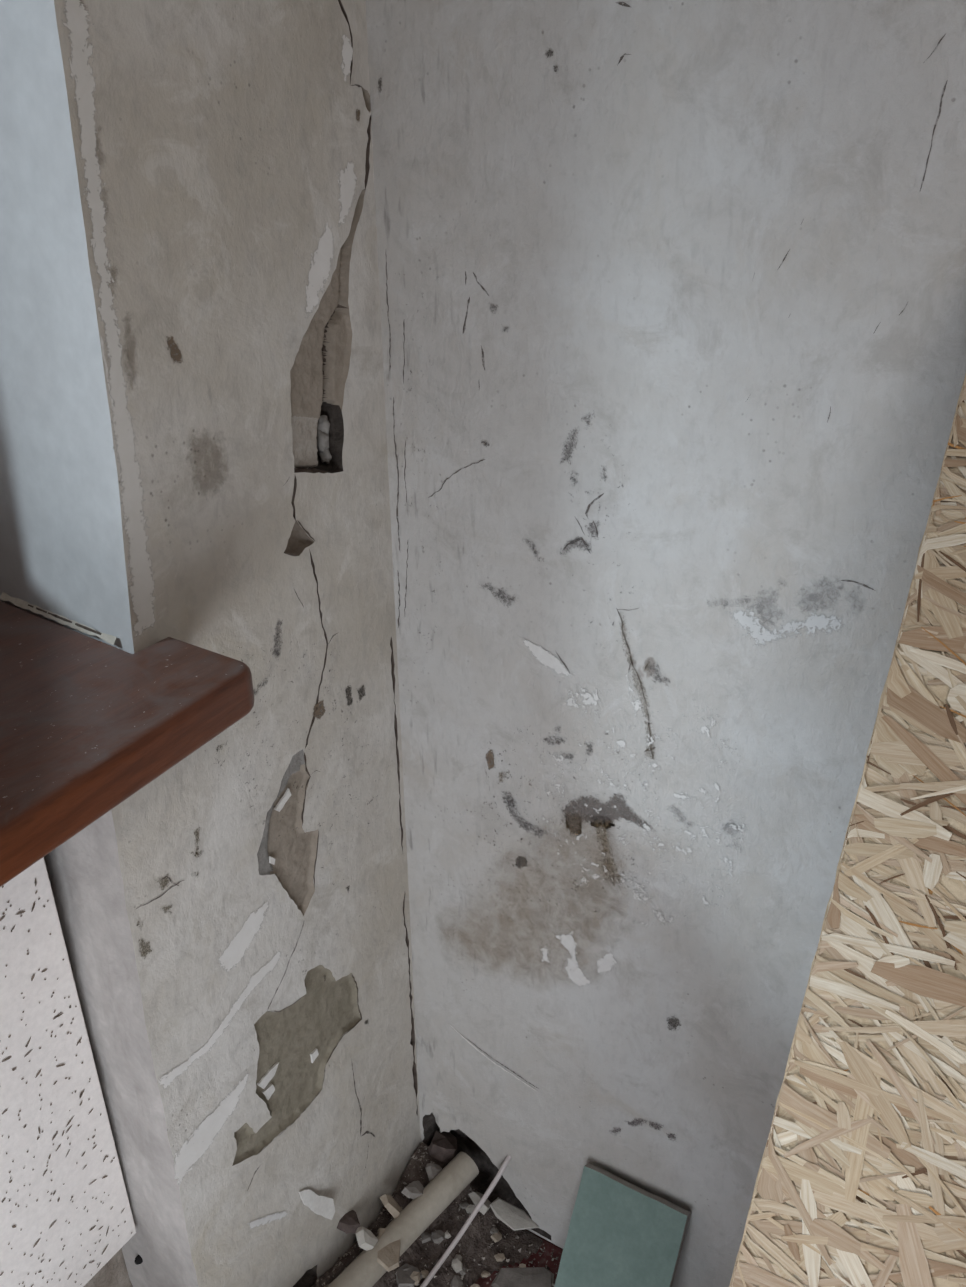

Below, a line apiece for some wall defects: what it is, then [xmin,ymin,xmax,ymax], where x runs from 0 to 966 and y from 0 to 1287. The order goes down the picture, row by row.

crack [338,0,371,190]
flaking render [290,190,366,473]
crack [283,476,297,521]
flaking render [284,520,315,556]
crack [386,262,485,850]
crack [294,549,339,772]
flaking render [257,749,319,916]
leakage [553,794,647,889]
flaking render [232,965,362,1166]
crack [403,894,418,1116]
leakage [597,950,617,974]
flaking render [422,1113,551,1240]